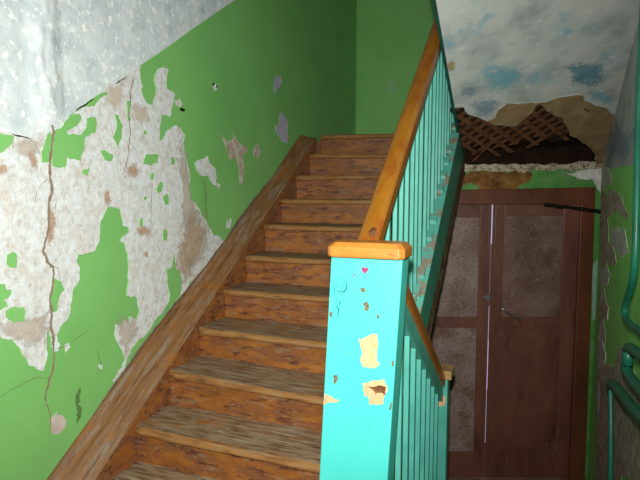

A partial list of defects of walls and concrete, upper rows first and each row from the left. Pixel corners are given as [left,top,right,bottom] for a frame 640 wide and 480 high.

crack [115,75,135,173]
peeling [220,134,261,184]
peeling [273,75,282,94]
peeling [275,112,288,144]
peeling [0,65,223,382]
crack [3,125,86,431]
flaking render [427,94,640,480]
peeling [49,411,66,435]